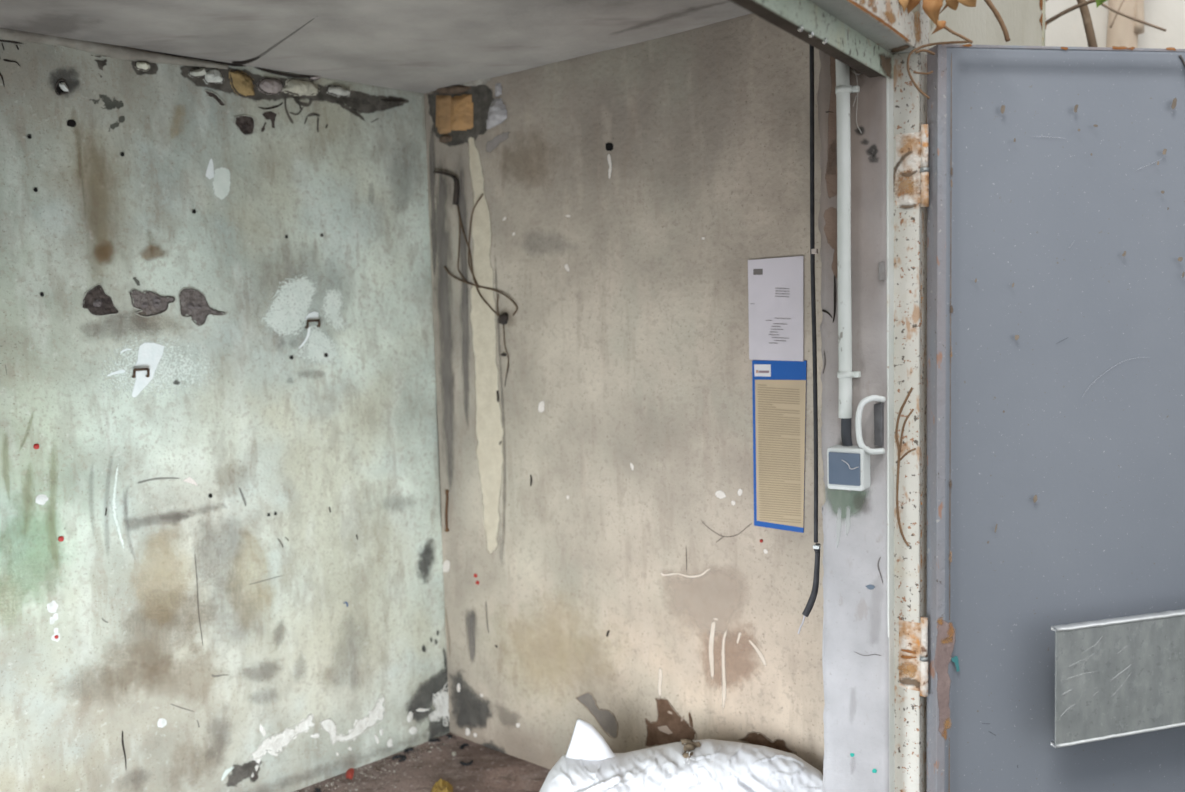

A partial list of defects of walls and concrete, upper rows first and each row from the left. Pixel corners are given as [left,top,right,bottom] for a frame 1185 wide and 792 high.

corrosion [847,0,921,78]
leakage [90,94,125,132]
spalling [180,66,409,136]
spalling [81,284,227,327]
flaking render [427,85,506,553]
corrosion [934,221,955,792]
leakage [408,631,504,753]
peeling [645,698,697,747]
leakage [708,634,752,683]
corrosion [898,649,920,687]